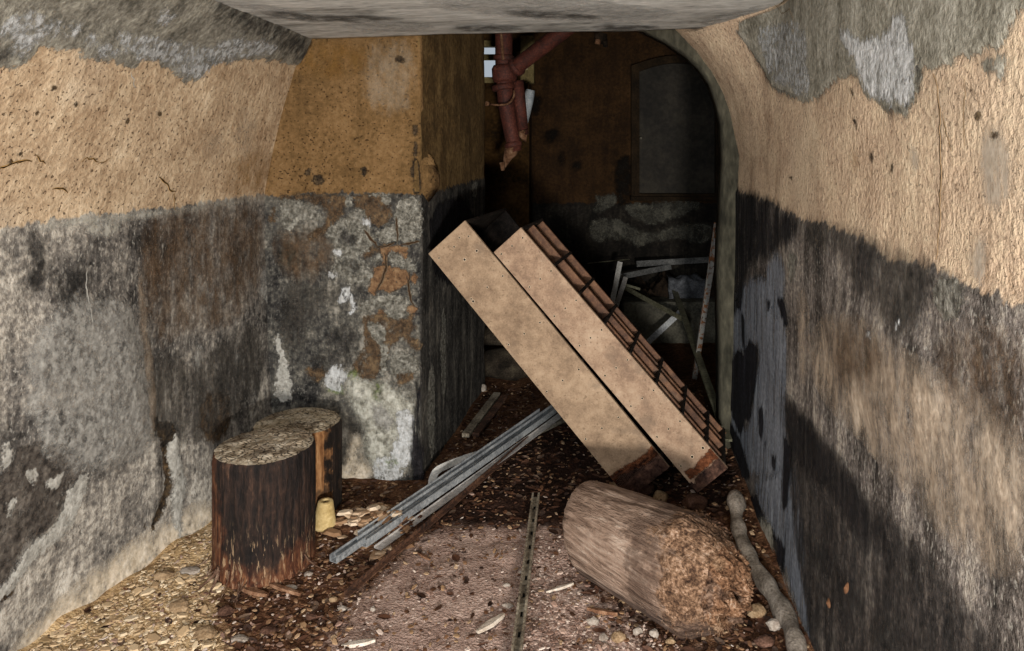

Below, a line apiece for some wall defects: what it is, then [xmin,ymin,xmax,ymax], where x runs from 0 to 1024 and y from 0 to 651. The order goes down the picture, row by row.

peeling [1,11,61,57]
peeling [72,25,278,78]
peeling [758,21,810,96]
peeling [840,15,914,107]
peeling [981,52,1007,82]
leakage [29,236,86,303]
peeling [268,125,424,404]
leakage [155,324,261,443]
efflorescence [273,334,294,402]
leakage [342,308,446,480]
leakage [690,188,1024,651]
leakage [23,505,212,648]